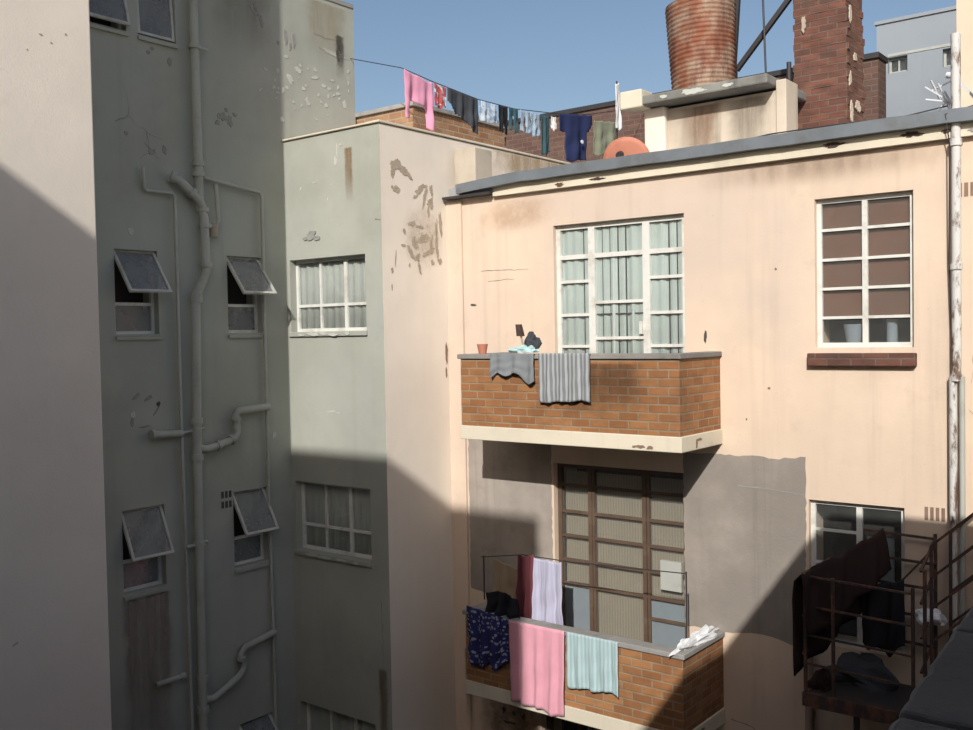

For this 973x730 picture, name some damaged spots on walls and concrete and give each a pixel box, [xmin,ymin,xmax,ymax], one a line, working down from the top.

peeling [259,28,350,121]
peeling [850,100,861,122]
peeling [390,158,442,275]